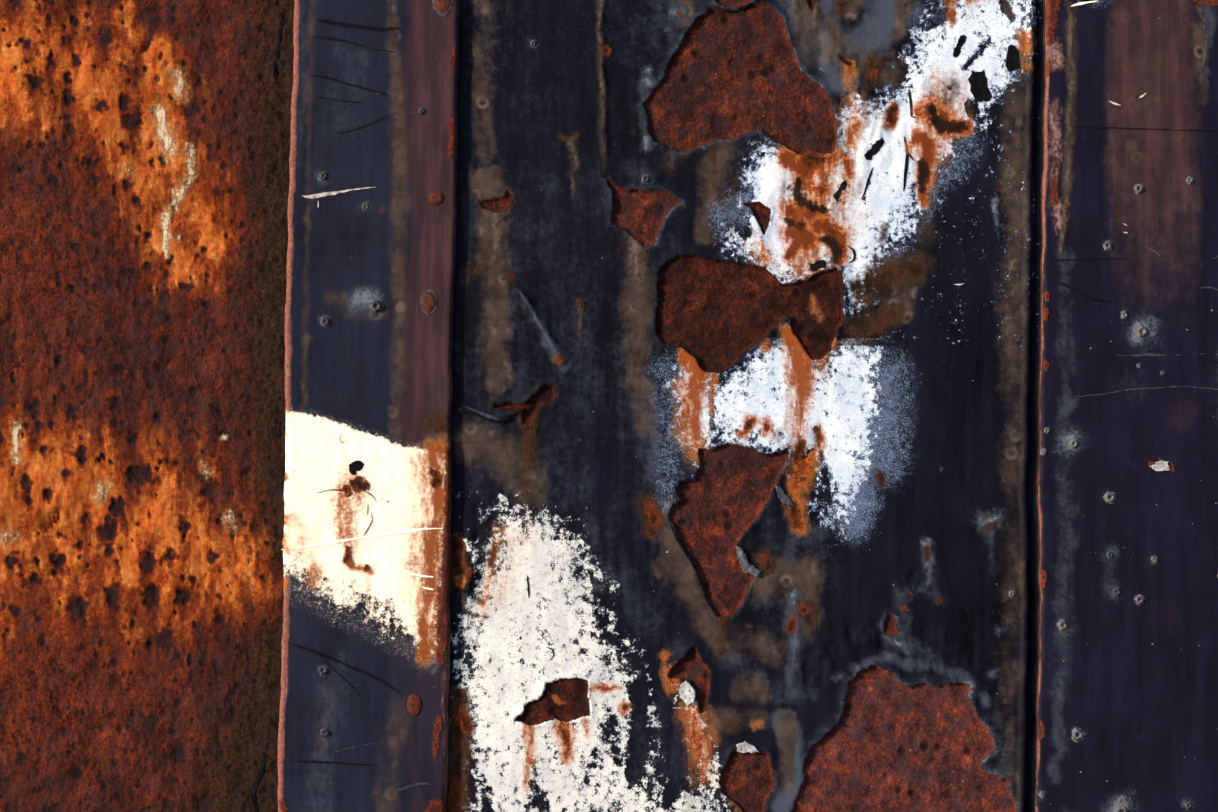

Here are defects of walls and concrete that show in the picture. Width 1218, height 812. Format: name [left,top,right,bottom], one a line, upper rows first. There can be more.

rust [0,0,229,291]
peeling [642,0,838,163]
rust [760,110,862,273]
rust [882,81,973,208]
peeling [607,178,847,654]
rust [0,414,286,648]
rust [337,474,373,575]
rust [410,413,497,665]
peeling [516,678,590,784]
peeling [664,646,711,777]
peeling [720,741,775,812]
peeling [792,663,1018,812]